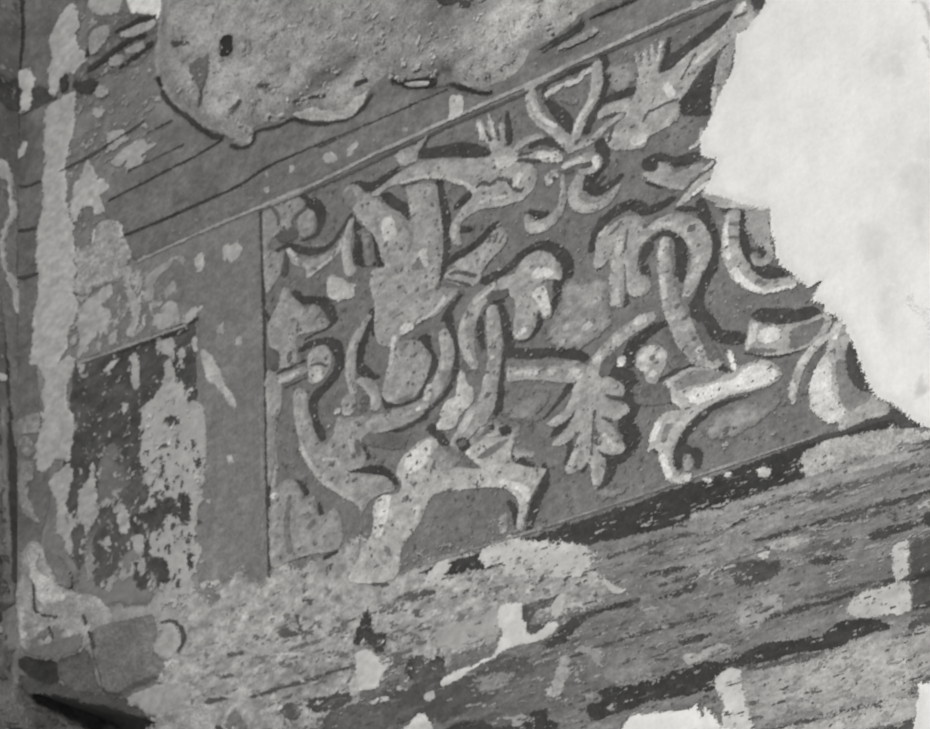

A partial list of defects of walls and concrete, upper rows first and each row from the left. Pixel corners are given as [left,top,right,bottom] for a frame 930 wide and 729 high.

crack [912,0,930,76]
peeling [605,57,639,92]
flaking render [700,0,930,429]
peeling [0,0,212,666]
peeling [421,559,456,589]
peeling [478,533,592,578]
peeling [355,648,387,691]
peeling [424,593,567,702]
peeling [127,682,196,717]
peeling [404,713,434,729]
flaking render [622,703,736,729]
flaking render [913,675,930,729]